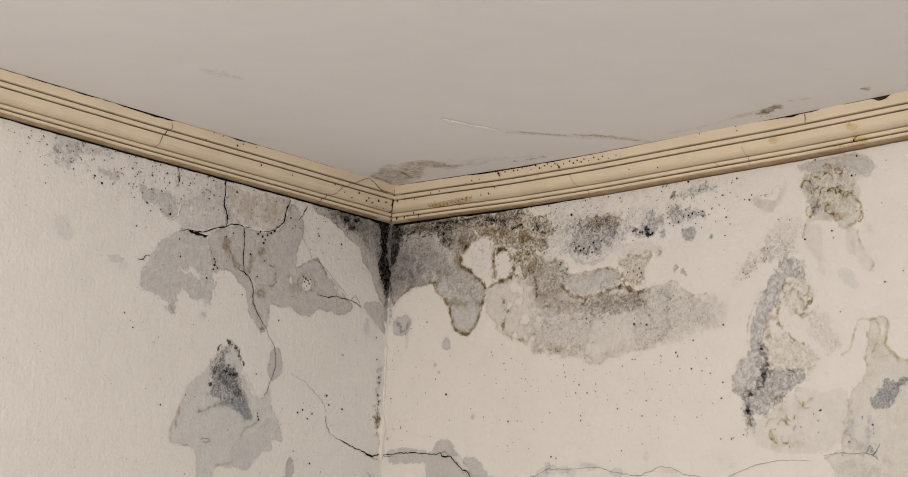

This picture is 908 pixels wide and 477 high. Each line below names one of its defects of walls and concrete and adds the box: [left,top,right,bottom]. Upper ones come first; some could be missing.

water stain [60,142,238,219]
crack [0,68,908,394]
water stain [373,202,566,299]
crack [291,373,471,477]